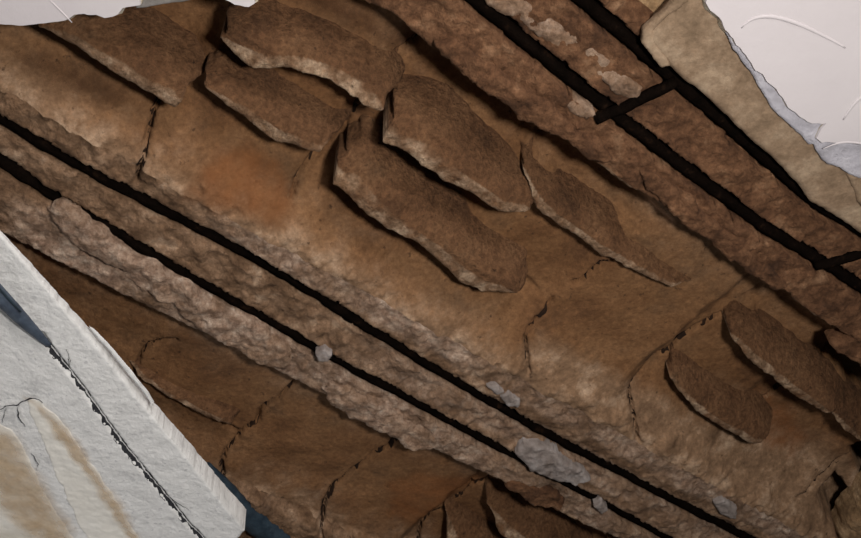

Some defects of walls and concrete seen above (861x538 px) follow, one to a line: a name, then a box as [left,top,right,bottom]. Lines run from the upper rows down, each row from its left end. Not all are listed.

spalling [0,0,594,366]
spalling [0,91,807,538]
crack [524,301,547,358]
spalling [365,0,861,538]
crack [661,314,713,353]
water stain [0,437,63,538]
water stain [54,423,97,480]
crack [219,380,293,475]
crack [320,437,398,531]
crack [627,378,636,429]